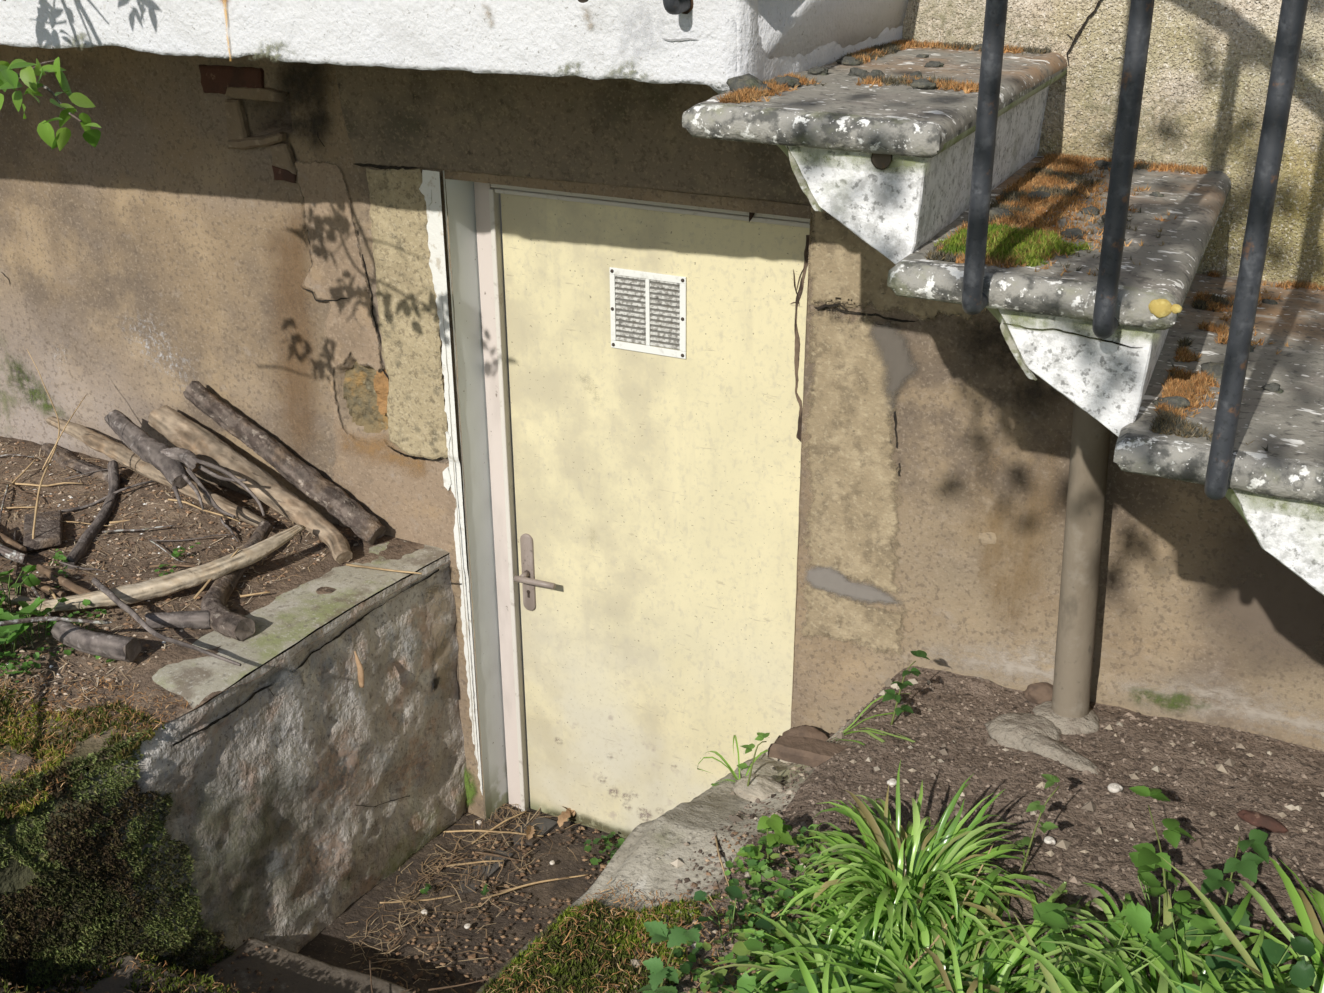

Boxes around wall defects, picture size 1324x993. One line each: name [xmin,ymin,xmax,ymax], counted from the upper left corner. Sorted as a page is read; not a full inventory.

crack [1065,0,1102,66]
flaking render [199,43,298,183]
crack [815,303,919,322]
flaking render [343,361,389,433]
crack [172,569,439,746]